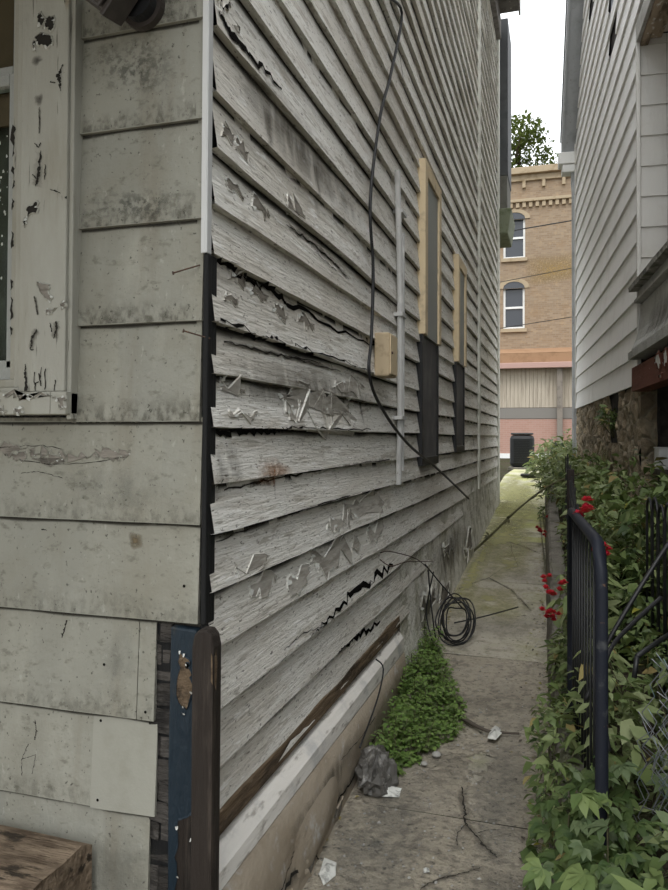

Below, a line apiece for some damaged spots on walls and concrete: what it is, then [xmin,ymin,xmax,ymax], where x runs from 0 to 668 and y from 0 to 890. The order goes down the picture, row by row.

peeling [32,11,56,52]
peeling [22,200,40,228]
peeling [36,281,68,315]
crack [224,341,341,372]
peeling [654,347,668,379]
peeling [0,389,68,416]
peeling [11,446,130,466]
peeling [175,651,192,717]
peeling [174,812,191,890]
crack [420,787,499,890]